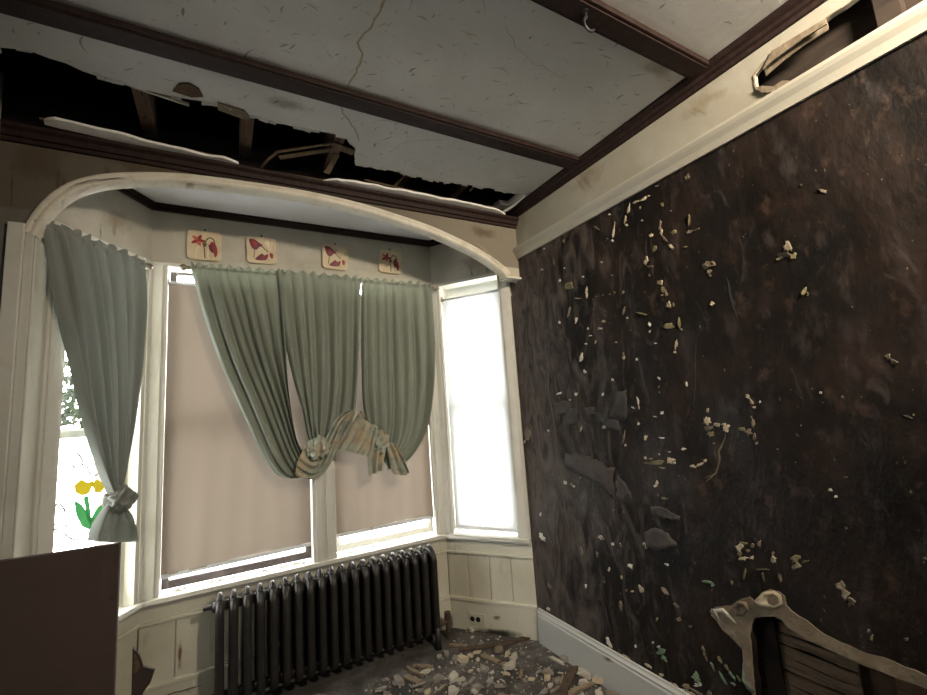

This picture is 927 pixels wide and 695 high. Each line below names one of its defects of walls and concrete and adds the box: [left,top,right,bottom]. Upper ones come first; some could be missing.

crack [341,0,389,142]
peeling [644,448,686,469]